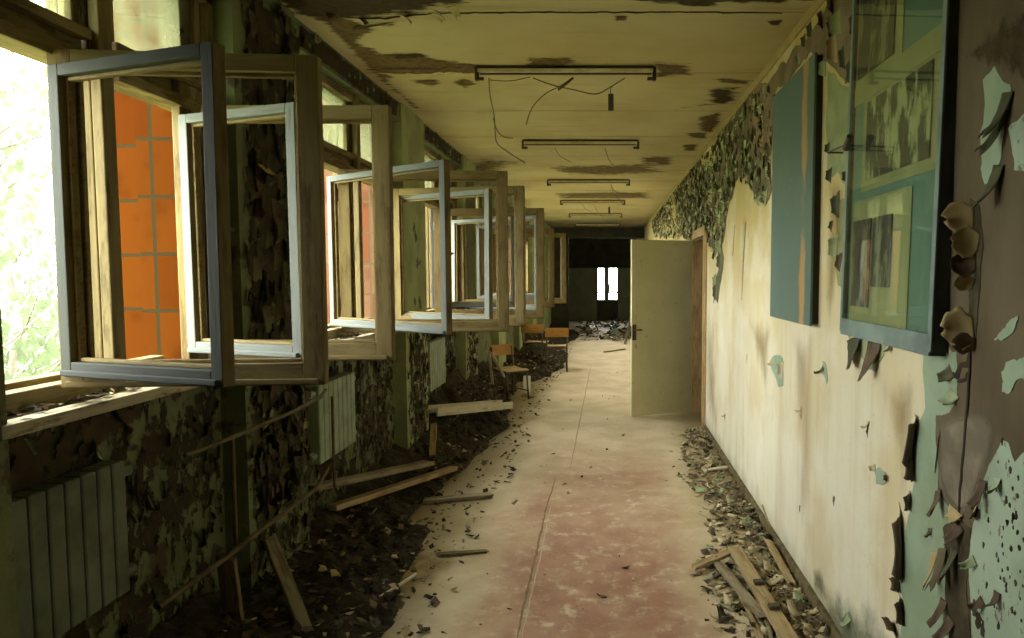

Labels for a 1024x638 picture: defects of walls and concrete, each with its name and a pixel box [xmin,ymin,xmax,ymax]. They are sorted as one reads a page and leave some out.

damp [318,16,477,108]
damp [526,58,575,66]
damp [553,157,674,175]
damp [655,64,692,77]
damp [684,78,750,151]
spalling [652,0,852,302]
peeling [242,124,292,340]
peeling [767,355,784,387]
peeling [846,336,892,382]
spalling [881,0,1024,638]
peeling [24,386,224,638]
peeling [245,360,395,583]